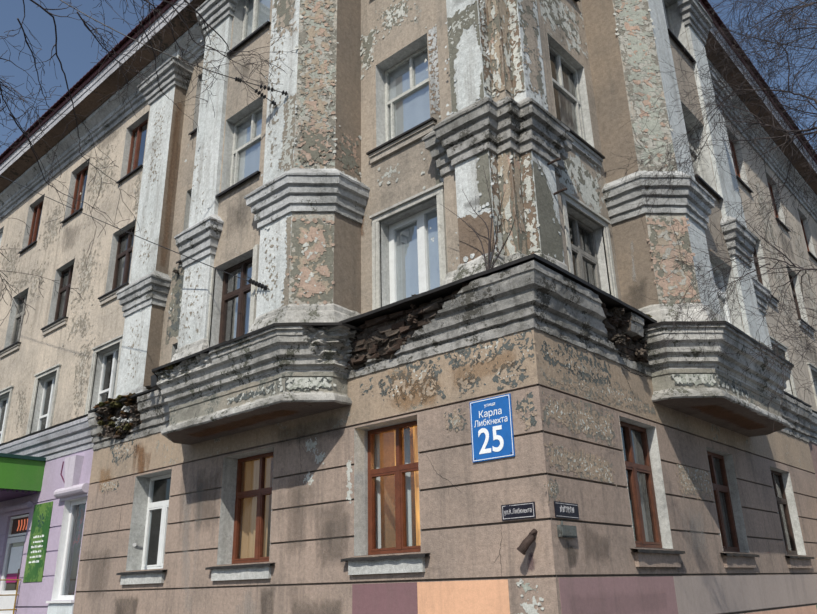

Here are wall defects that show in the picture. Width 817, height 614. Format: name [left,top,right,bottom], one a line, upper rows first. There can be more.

peeling [613,0,677,172]
peeling [559,154,604,213]
peeling [256,213,335,308]
peeling [646,217,700,304]
spalling [95,400,142,469]
peeling [227,377,336,404]
spalling [345,281,665,503]
peeling [516,577,544,614]